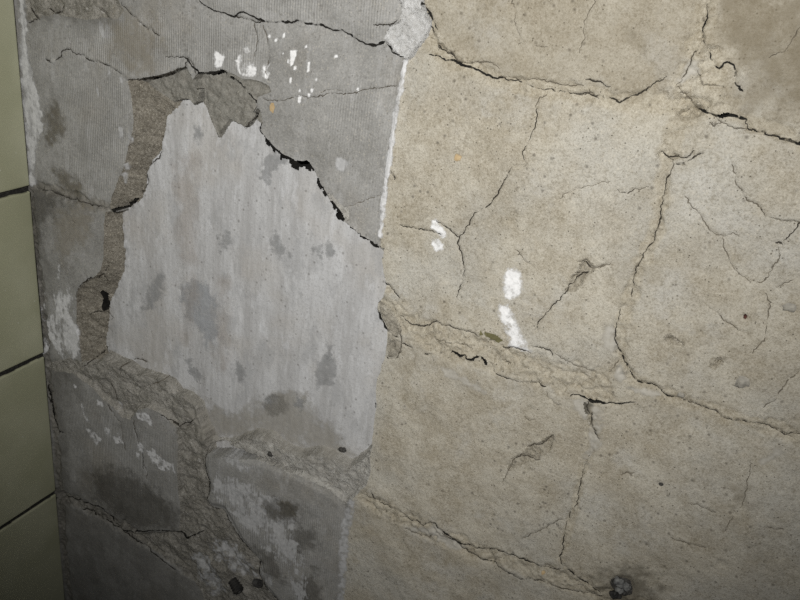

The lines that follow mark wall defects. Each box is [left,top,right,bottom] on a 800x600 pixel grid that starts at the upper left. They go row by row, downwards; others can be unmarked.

crack [200,1,402,80]
crack [37,37,395,248]
crack [401,1,800,297]
spalling [46,51,387,600]
crack [378,150,800,439]
crack [68,496,204,569]
crack [372,464,601,596]
crack [503,434,554,480]
crack [690,463,752,531]